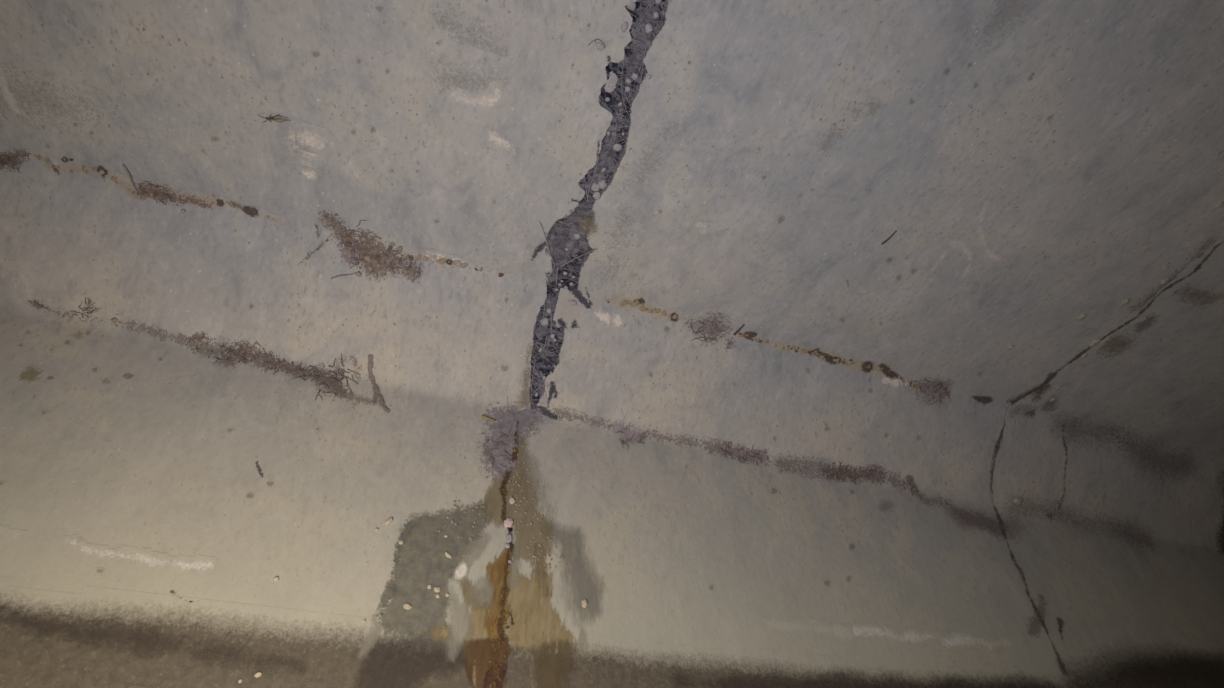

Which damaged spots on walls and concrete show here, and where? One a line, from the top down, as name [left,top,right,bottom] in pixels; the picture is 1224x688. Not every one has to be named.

damp [0,500,490,688]
crack [489,421,519,688]
rust [461,465,573,688]
damp [478,402,598,617]
damp [501,615,1224,688]